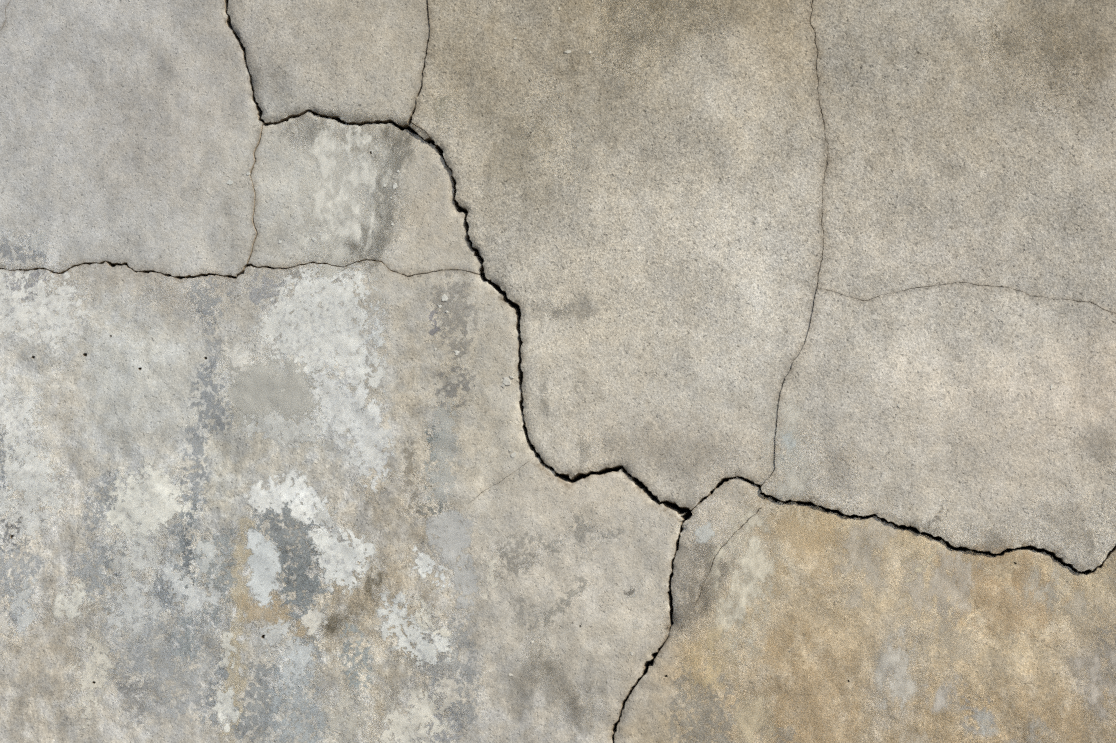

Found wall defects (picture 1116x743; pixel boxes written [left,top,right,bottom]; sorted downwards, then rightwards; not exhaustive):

crack [0,0,485,279]
crack [775,0,1047,444]
crack [480,276,1116,743]